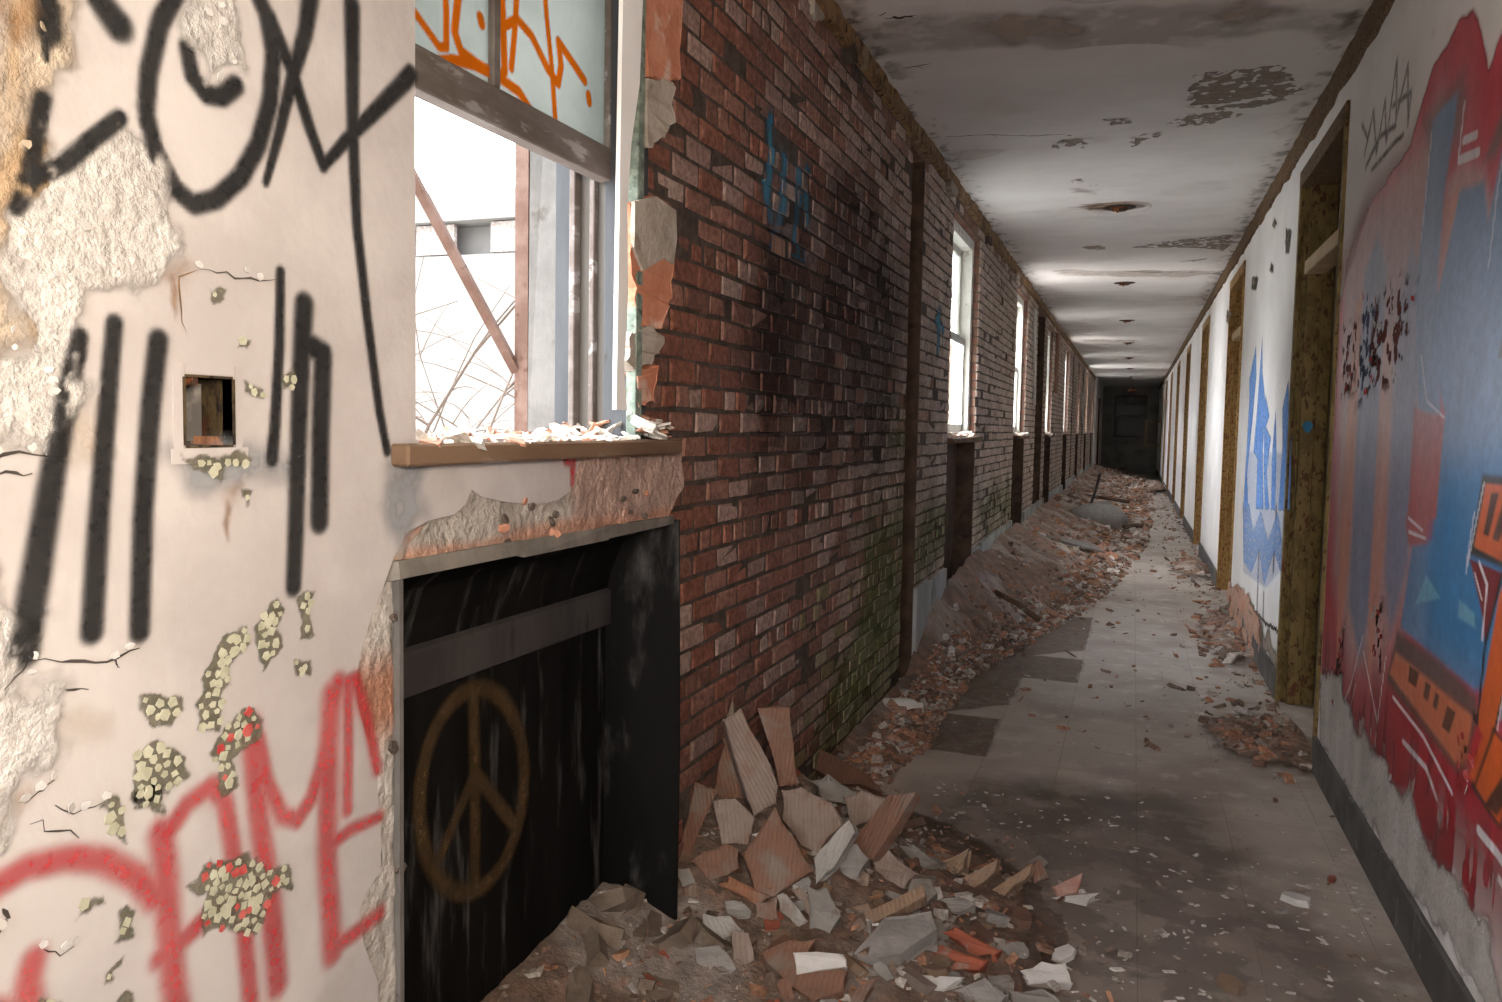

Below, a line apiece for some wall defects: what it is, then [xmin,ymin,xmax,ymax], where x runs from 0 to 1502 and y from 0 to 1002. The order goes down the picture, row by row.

peeling [0,0,185,447]
peeling [179,0,247,81]
spalling [402,0,684,559]
peeling [1102,118,1160,147]
peeling [1176,65,1303,127]
peeling [0,604,64,855]
peeling [101,591,315,843]
peeling [187,853,293,937]